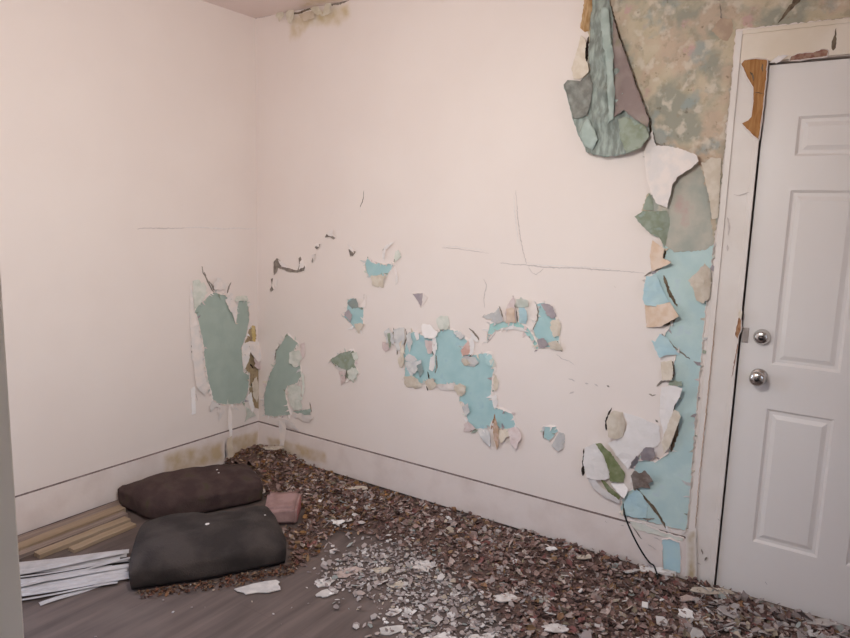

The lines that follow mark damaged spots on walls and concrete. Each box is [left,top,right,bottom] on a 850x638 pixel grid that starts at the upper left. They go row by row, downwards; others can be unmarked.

water stain [287,0,353,44]
crack [778,0,800,23]
peeling [341,293,367,334]
peeling [348,242,401,288]
crack [504,193,690,386]
peeling [190,267,313,459]
peeling [328,348,360,385]
peeling [382,296,573,452]
crack [669,402,679,452]
crack [695,326,715,526]
crack [637,489,666,529]
peeling [620,510,684,573]